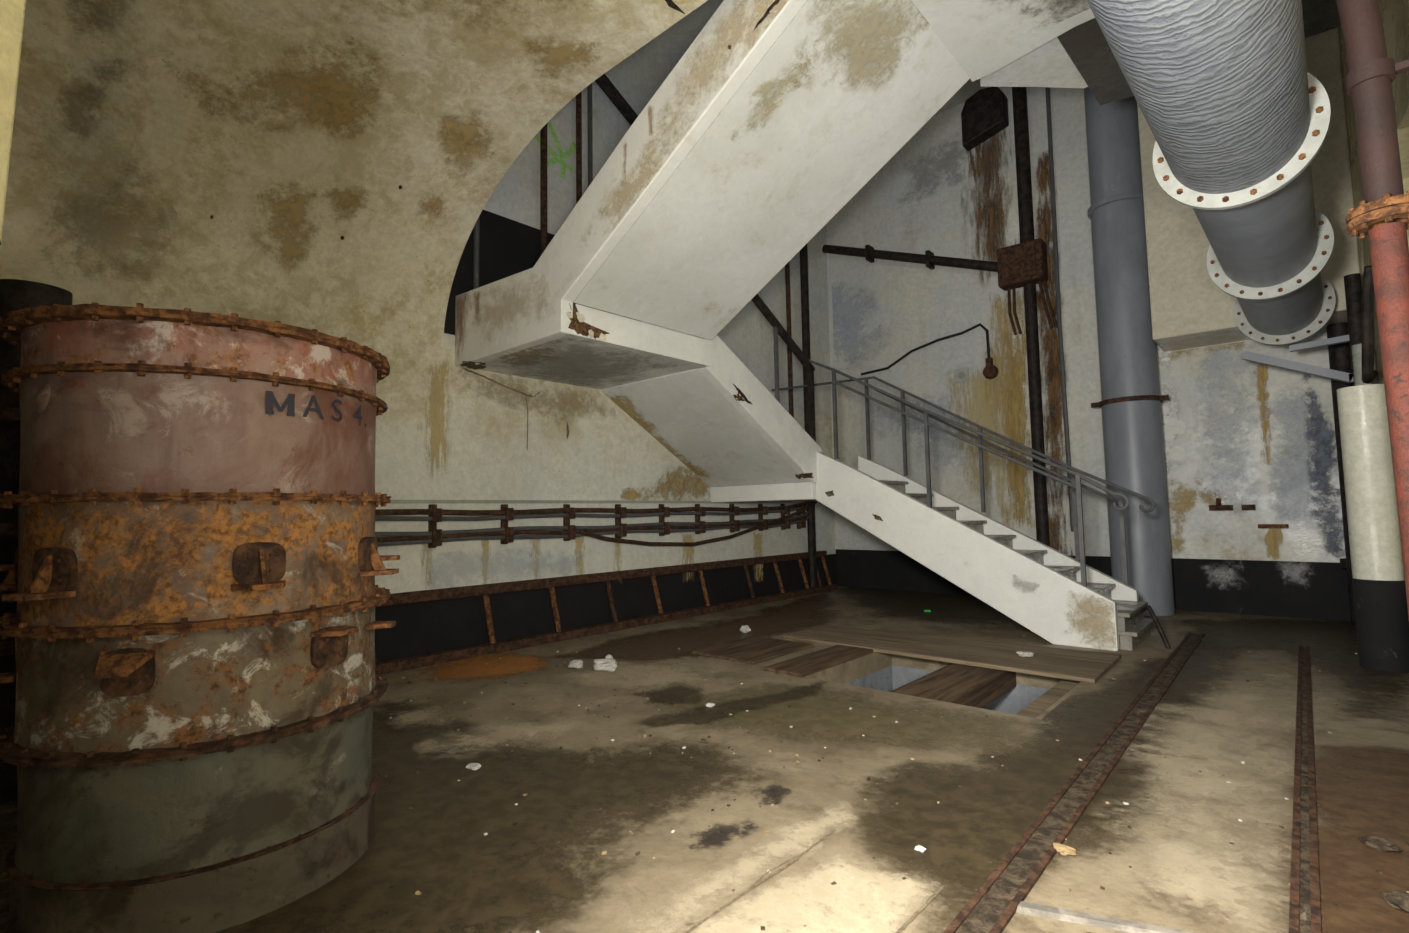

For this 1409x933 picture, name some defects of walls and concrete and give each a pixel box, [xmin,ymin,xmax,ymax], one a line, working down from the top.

crack [665,0,685,14]
crack [753,0,780,31]
water stain [268,184,362,263]
spalling [566,302,610,341]
rust [954,130,1072,557]
rust [1257,364,1271,462]
water stain [1304,375,1345,557]
rust [1264,528,1283,559]
water stain [1049,619,1409,864]
water stain [214,658,1167,933]
water stain [1273,836,1292,914]
water stain [1314,746,1409,933]